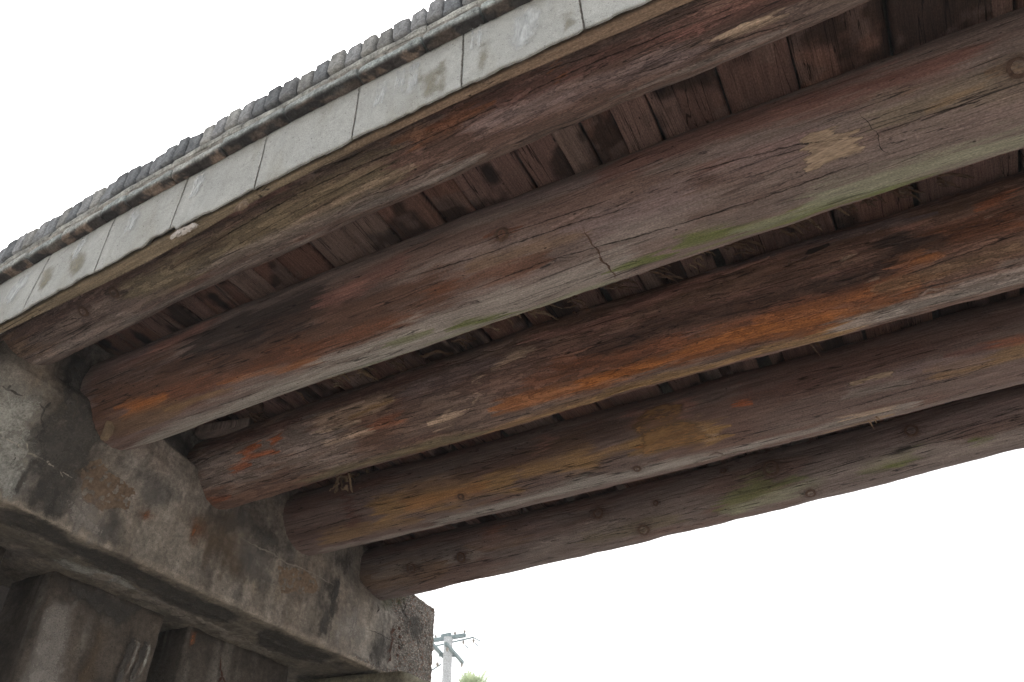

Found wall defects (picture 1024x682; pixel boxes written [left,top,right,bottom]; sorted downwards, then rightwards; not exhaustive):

crack [583,227,616,277]
water stain [0,358,237,622]